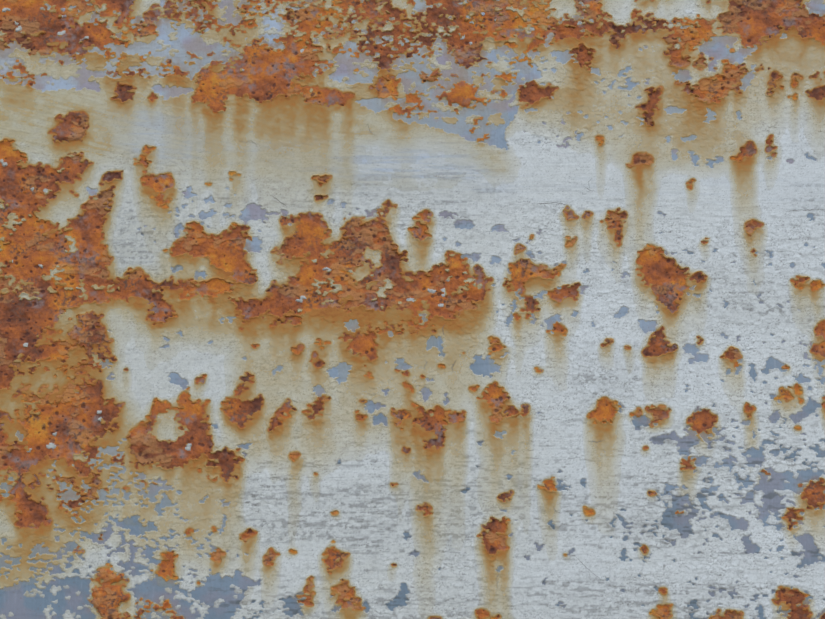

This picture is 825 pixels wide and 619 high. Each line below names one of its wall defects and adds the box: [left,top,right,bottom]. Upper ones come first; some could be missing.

peeling [0,0,313,100]
peeling [547,1,594,32]
rust [0,0,825,208]
rust [562,205,628,251]
rust [635,244,708,369]
rust [0,102,581,587]
rust [809,319,825,368]
peeling [555,470,586,491]
peeling [0,439,264,619]
rust [87,550,185,619]
peeling [273,592,306,617]
rust [771,586,825,619]